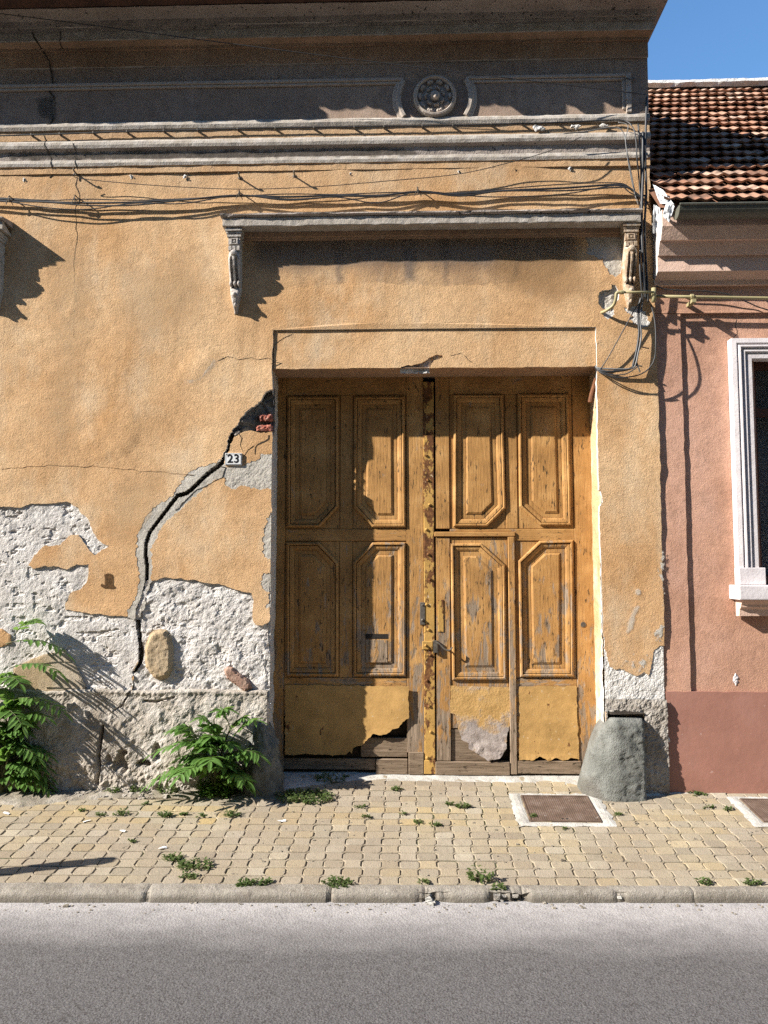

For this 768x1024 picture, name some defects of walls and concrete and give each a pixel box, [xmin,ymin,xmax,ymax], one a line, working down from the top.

crack [32,32,80,335]
flaking render [0,454,272,702]
crack [88,429,270,781]
flaking render [598,552,664,722]